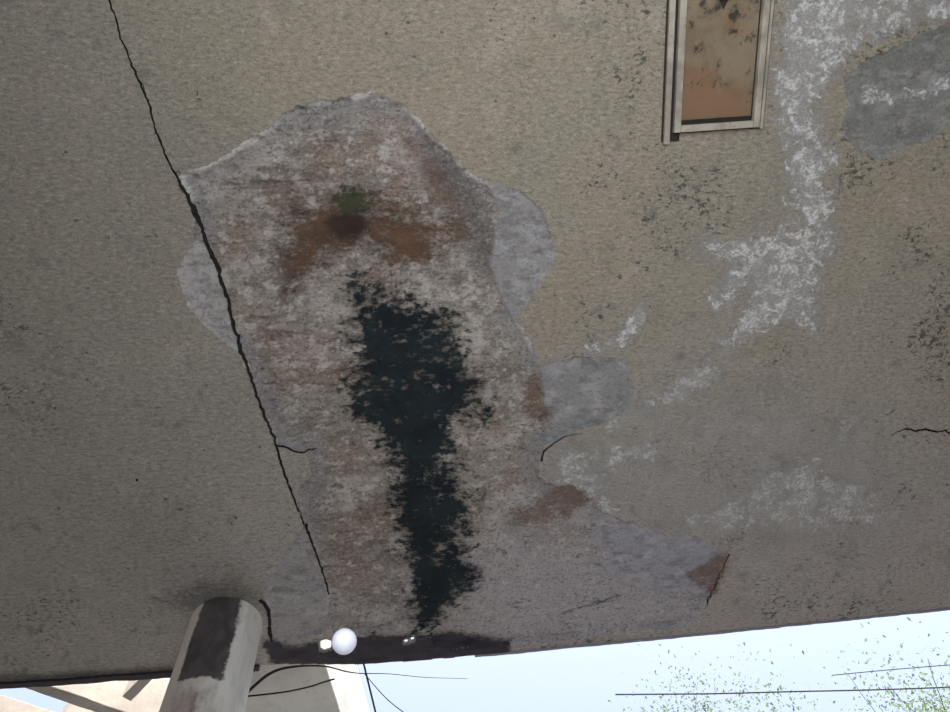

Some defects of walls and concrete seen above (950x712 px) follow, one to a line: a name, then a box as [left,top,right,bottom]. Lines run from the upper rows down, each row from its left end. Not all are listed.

peeling [842,25,950,160]
leakage [702,0,950,351]
crack [108,0,330,595]
corrosion [276,185,453,294]
leakage [262,268,511,665]
spalling [177,92,730,651]
leakage [554,440,657,518]
leakage [584,304,645,357]
leakage [605,358,721,432]
leakage [676,415,877,534]
crack [892,427,950,435]